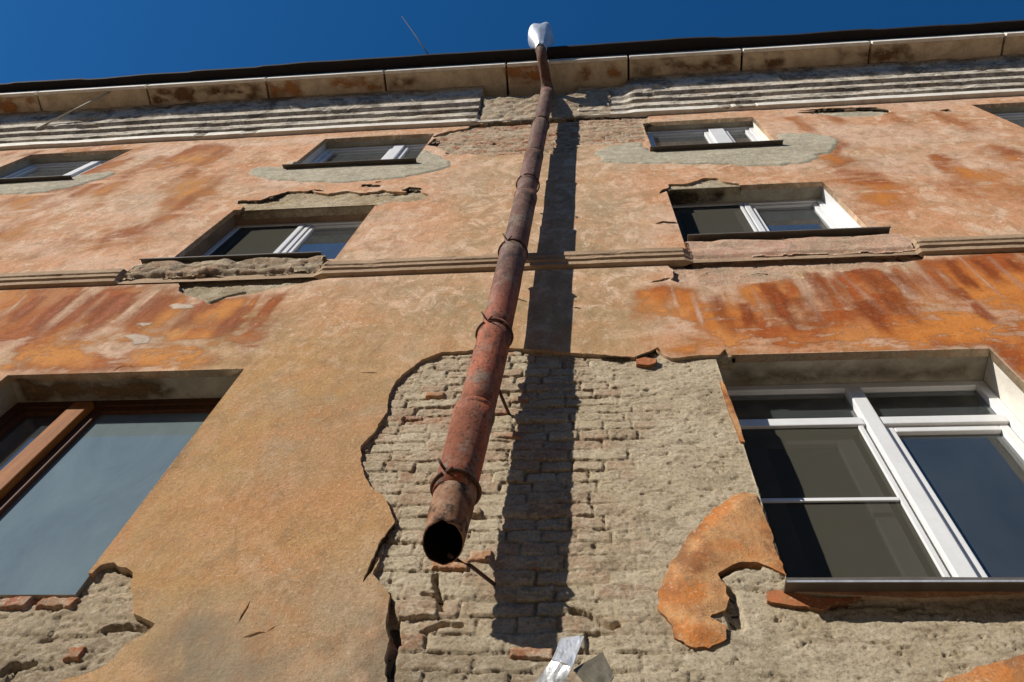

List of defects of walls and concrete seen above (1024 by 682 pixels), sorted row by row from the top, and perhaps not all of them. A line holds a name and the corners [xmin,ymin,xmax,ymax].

spalling [429,123,532,156]
spalling [543,117,650,155]
corrosion [0,284,285,372]
spalling [169,278,321,309]
corrosion [636,252,1024,375]
spalling [361,351,1024,682]
spalling [0,568,152,682]